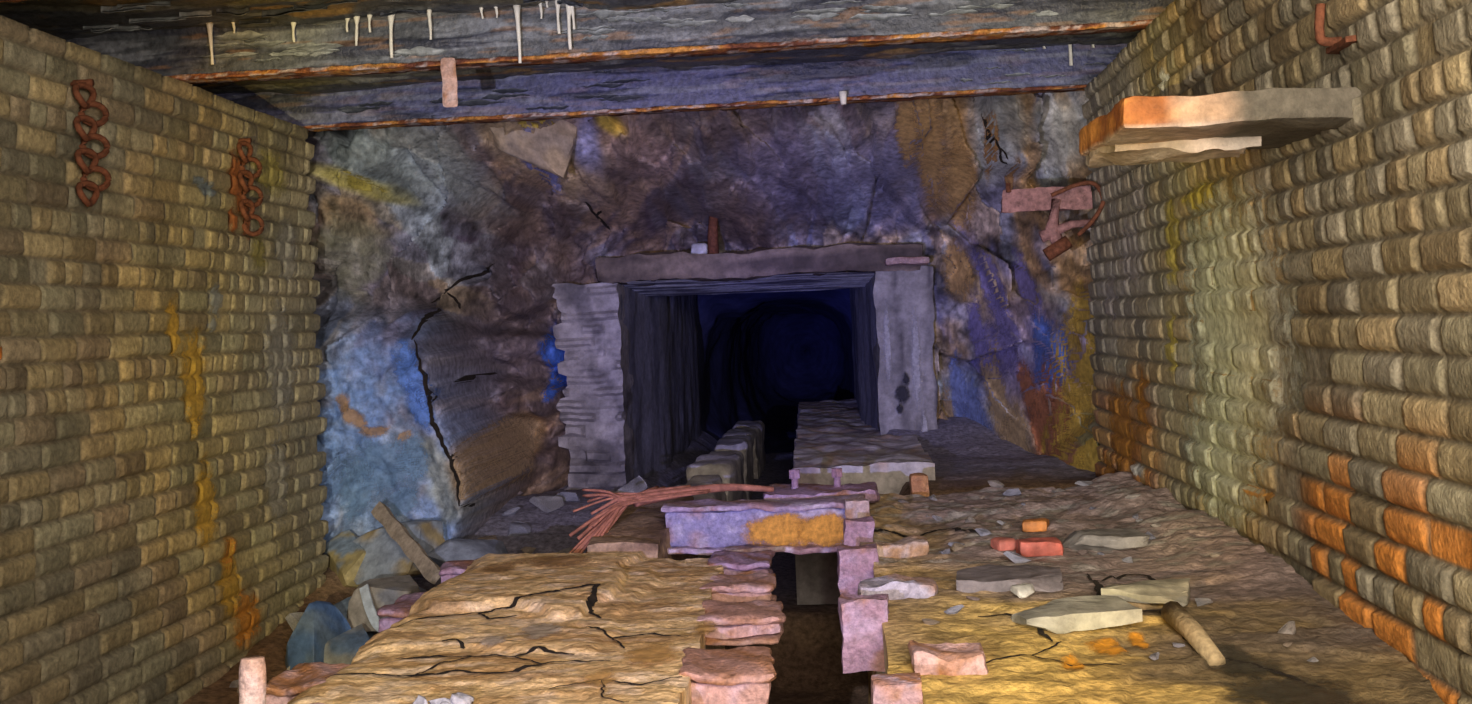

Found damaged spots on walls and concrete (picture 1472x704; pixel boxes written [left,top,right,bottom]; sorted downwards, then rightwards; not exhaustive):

rust [228,154,250,239]
crack [411,263,497,507]
crack [325,584,688,702]